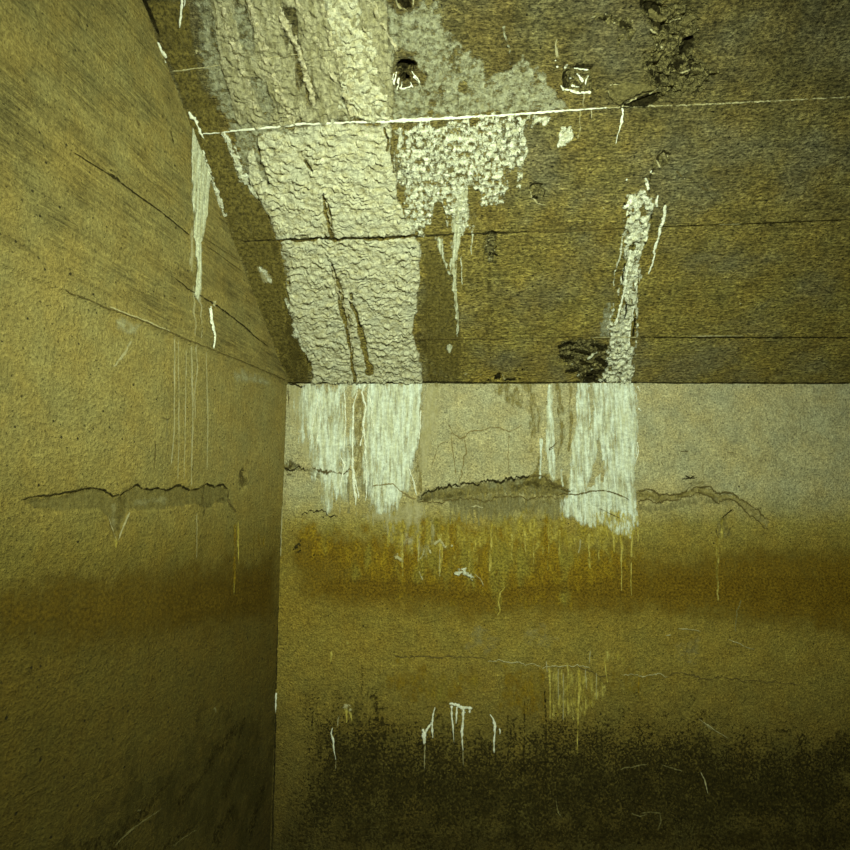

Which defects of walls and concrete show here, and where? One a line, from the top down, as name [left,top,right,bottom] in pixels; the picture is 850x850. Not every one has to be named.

spalling [608,0,720,108]
crack [22,417,236,538]
crack [65,280,401,572]
rust [300,508,640,615]
water stain [149,0,850,628]
spalling [557,338,613,383]
crack [422,377,849,385]
crack [557,475,771,529]
crack [271,599,279,850]
water stain [284,650,850,850]